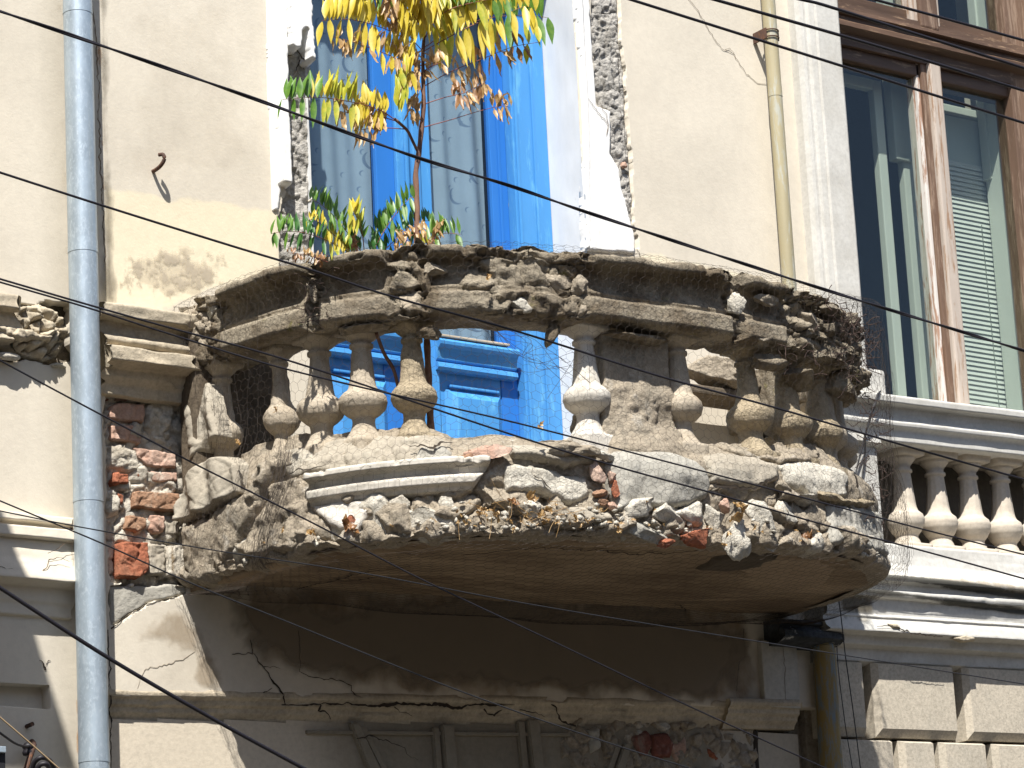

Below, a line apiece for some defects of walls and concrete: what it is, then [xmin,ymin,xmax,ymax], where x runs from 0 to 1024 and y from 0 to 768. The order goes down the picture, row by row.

spalling [591,0,632,222]
damp [132,251,214,295]
spalling [399,292,422,311]
spalling [424,262,447,276]
spalling [511,297,532,313]
spalling [545,273,588,317]
spalling [727,292,779,315]
spalling [687,355,737,390]
spalling [750,338,858,404]
flaking render [103,397,186,625]
spalling [314,442,844,571]
crack [233,637,576,727]